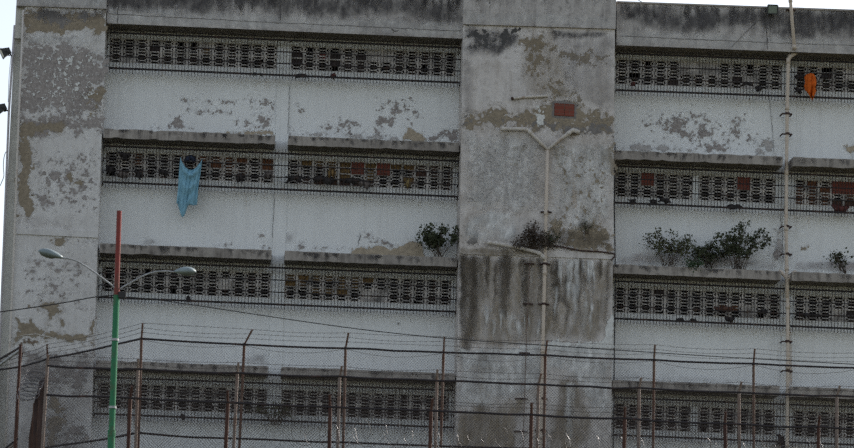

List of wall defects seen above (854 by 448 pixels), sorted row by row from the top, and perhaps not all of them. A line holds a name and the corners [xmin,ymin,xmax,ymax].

water stain [92,0,219,13]
water stain [237,0,459,22]
water stain [623,5,854,37]
peeling [14,7,109,217]
peeling [151,98,274,136]
flaking render [374,31,618,252]
peeling [631,111,773,156]
water stain [559,147,621,226]
flaking render [13,259,97,346]
water stain [458,249,618,448]